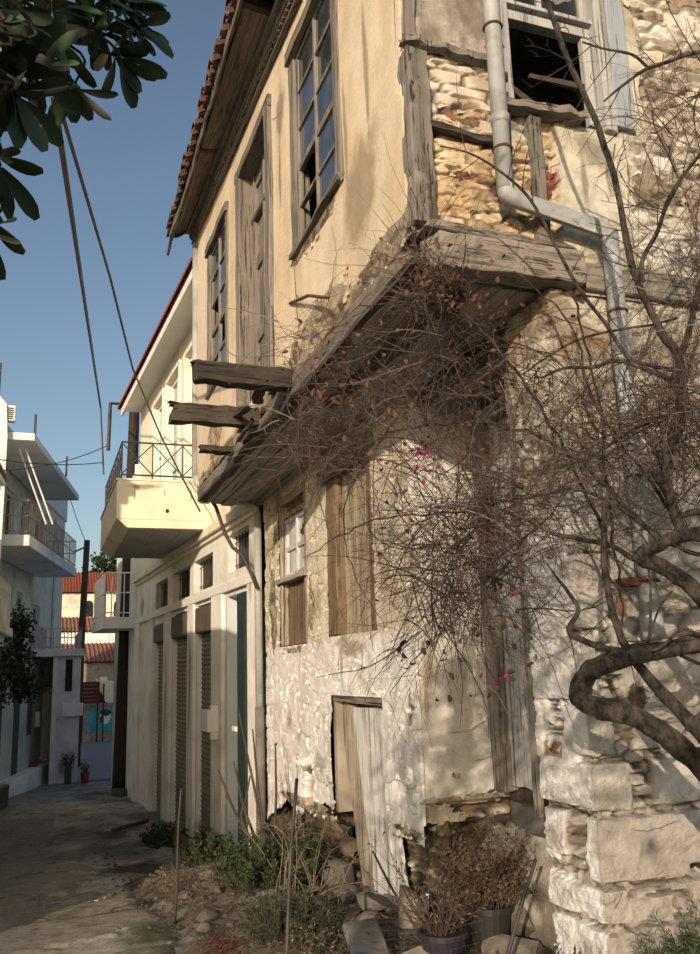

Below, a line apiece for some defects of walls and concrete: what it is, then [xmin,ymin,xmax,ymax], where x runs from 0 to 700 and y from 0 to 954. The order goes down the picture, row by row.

spalling [437,104,480,129]
flaking render [449,167,479,180]
flaking render [544,149,560,200]
flaking render [282,213,406,369]